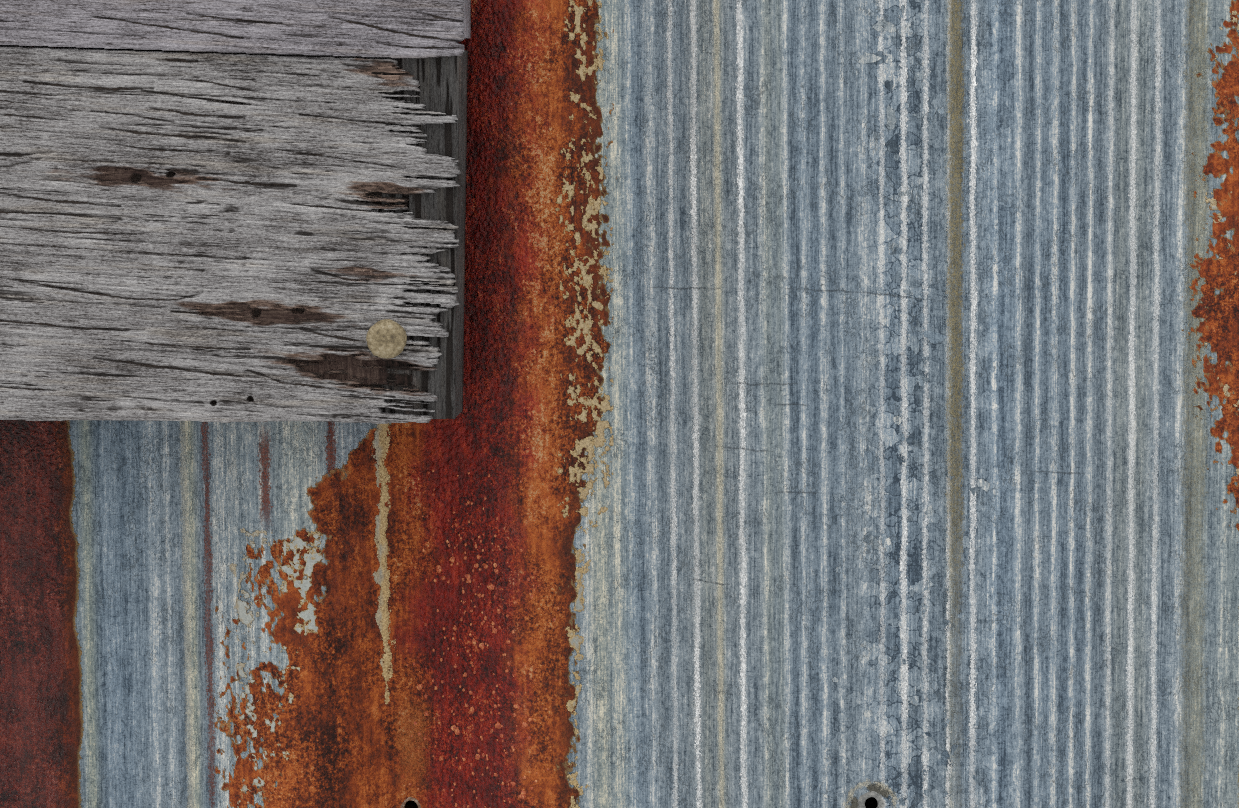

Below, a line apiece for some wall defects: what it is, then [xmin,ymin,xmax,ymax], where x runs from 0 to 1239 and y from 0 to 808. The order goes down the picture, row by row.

corrosion [0,420,84,808]
peeling [229,528,323,808]
corrosion [201,0,614,808]
corrosion [1181,0,1239,531]